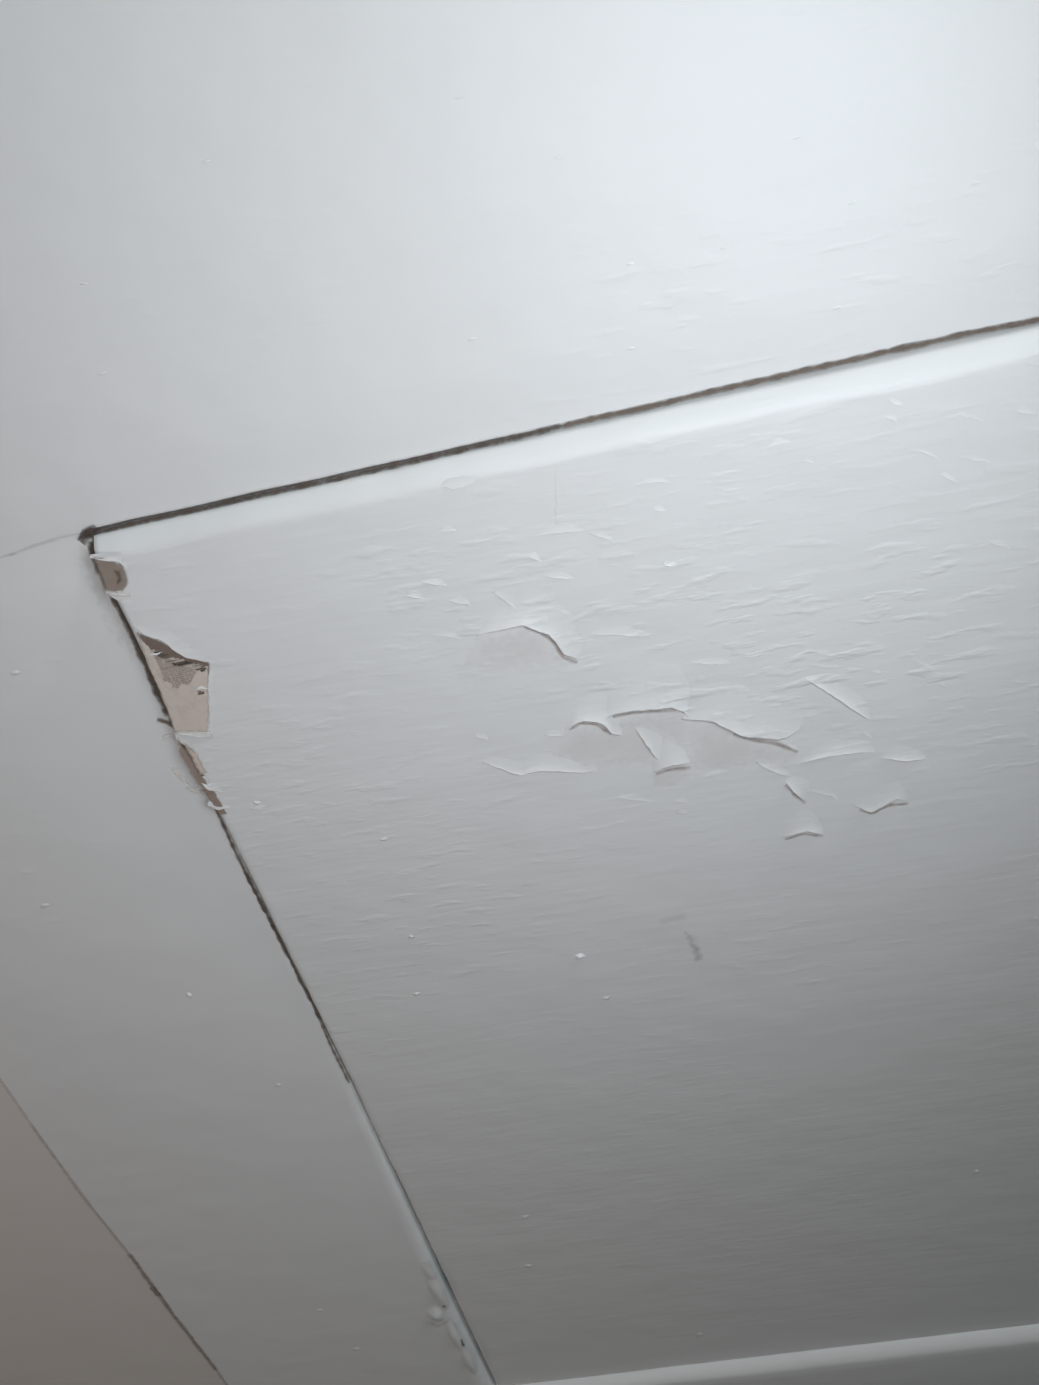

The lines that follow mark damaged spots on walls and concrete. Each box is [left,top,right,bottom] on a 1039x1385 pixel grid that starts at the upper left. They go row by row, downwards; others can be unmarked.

spalling [90,552,131,601]
spalling [134,626,229,814]
peeling [482,652,926,837]